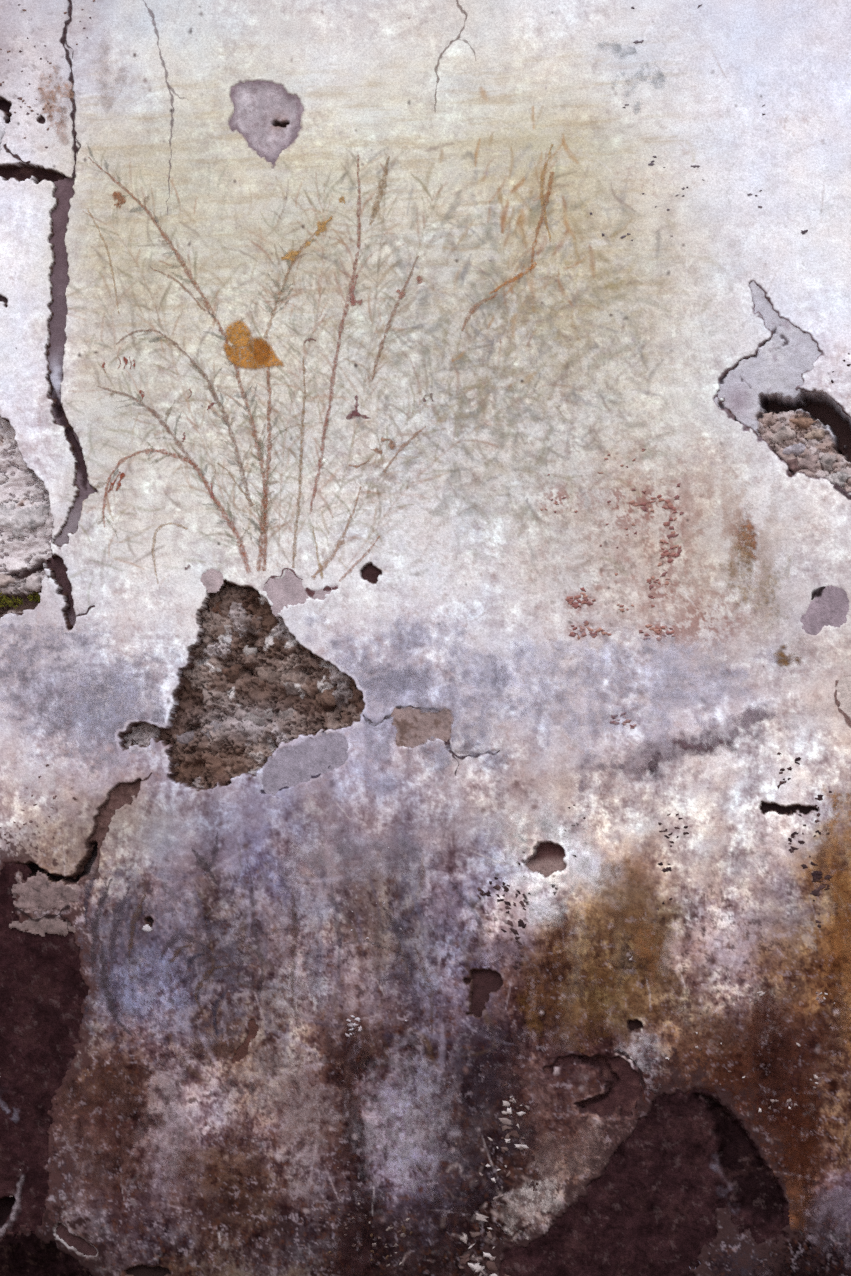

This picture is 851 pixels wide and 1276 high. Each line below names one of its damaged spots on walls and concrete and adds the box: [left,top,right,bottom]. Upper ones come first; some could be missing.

crack [144,1,180,215]
spalling [229,81,304,168]
crack [434,0,476,107]
crack [0,0,97,628]
spalling [714,281,851,492]
spalling [0,417,54,618]
spalling [124,568,365,796]
spalling [391,706,455,748]
spalling [800,585,849,635]
spalling [526,842,566,877]
spalling [0,861,97,1276]
spalling [499,1055,790,1276]